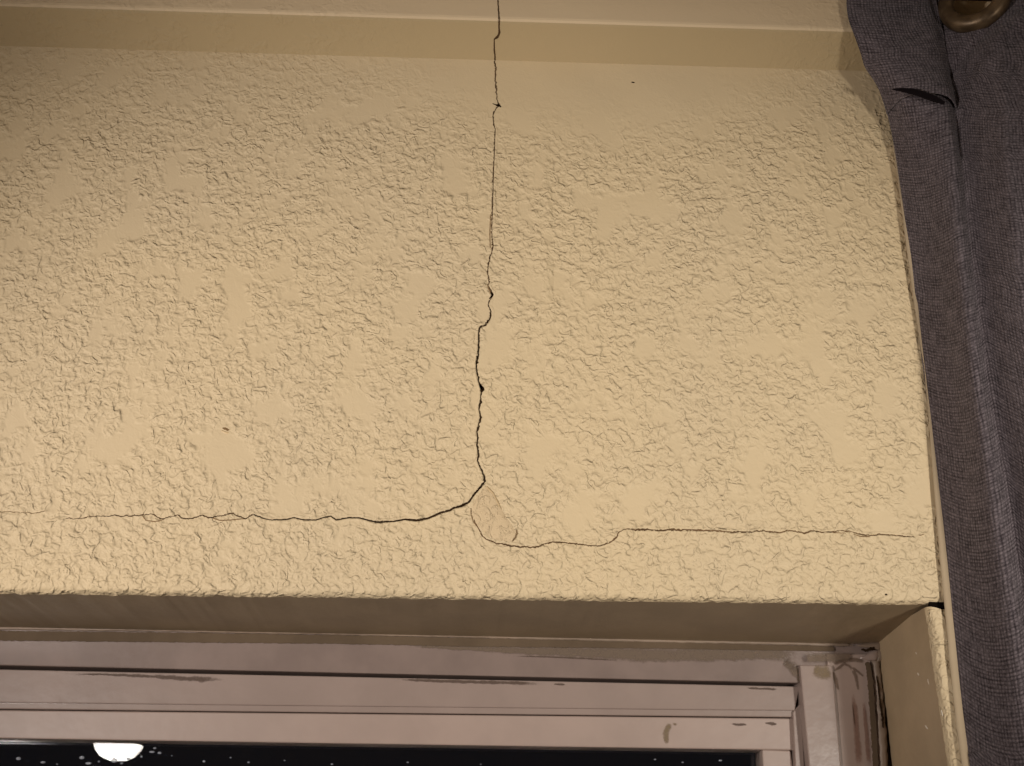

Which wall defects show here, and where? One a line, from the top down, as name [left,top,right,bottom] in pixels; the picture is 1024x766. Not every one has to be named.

crack [3,0,924,548]